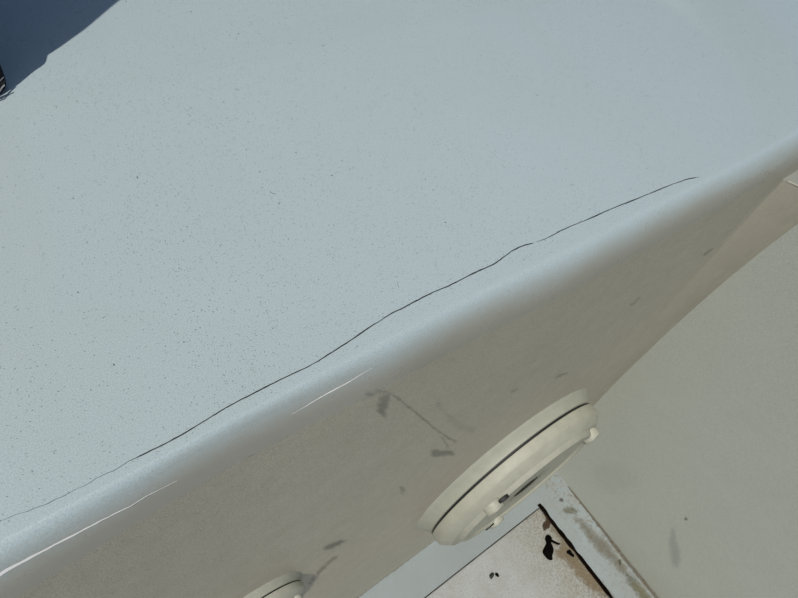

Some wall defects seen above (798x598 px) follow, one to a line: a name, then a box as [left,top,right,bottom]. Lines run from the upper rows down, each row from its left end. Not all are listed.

crack [1,177,696,521]